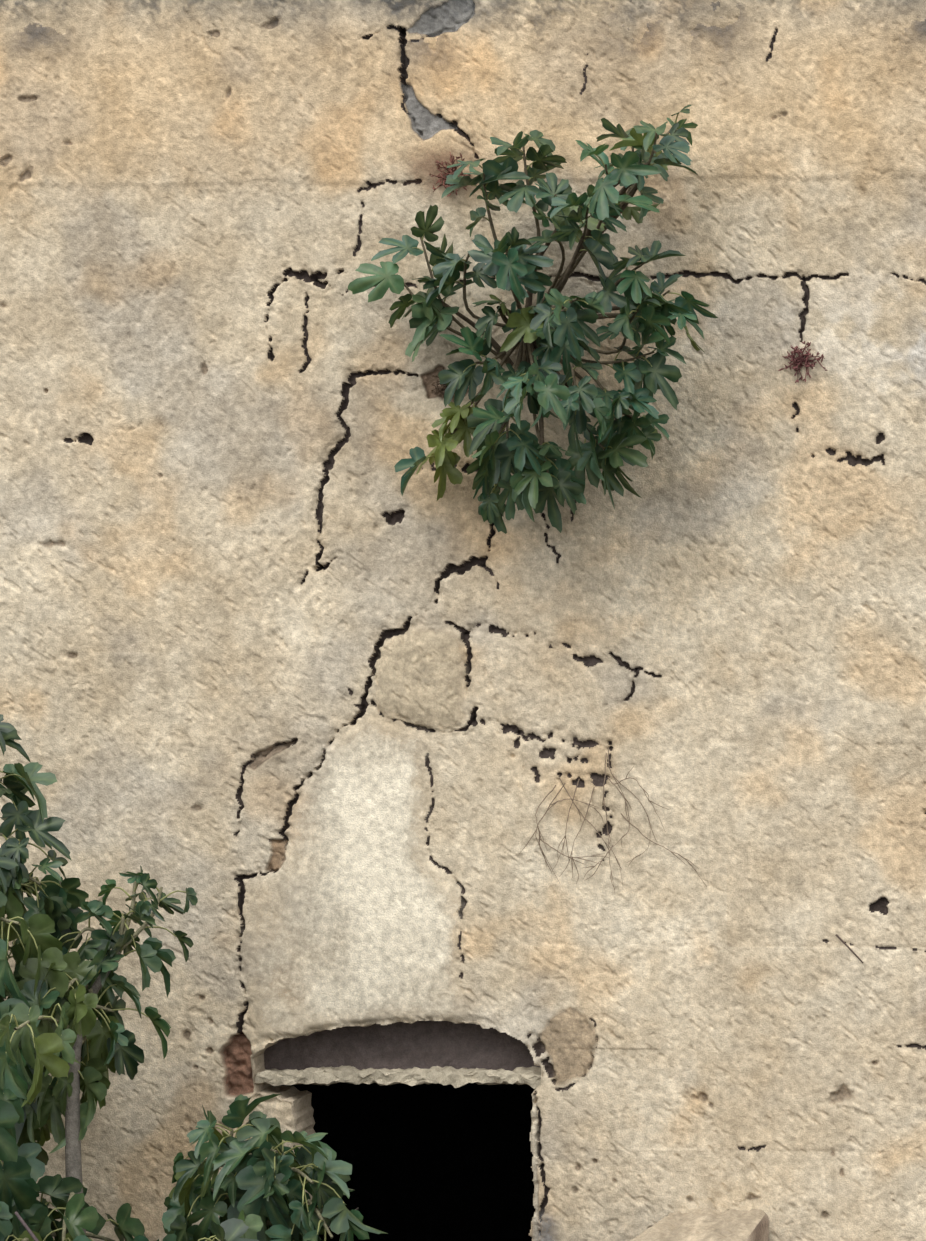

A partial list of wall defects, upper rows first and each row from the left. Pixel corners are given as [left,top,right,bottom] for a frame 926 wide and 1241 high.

water stain [27,23,49,41]
water stain [381,0,436,16]
spalling [407,0,475,36]
crack [766,29,778,61]
crack [362,25,479,159]
spalling [401,83,458,140]
crack [264,179,422,373]
crack [549,270,849,342]
crack [791,402,800,432]
crack [301,369,418,585]
crack [609,652,662,701]
crack [234,491,577,1034]